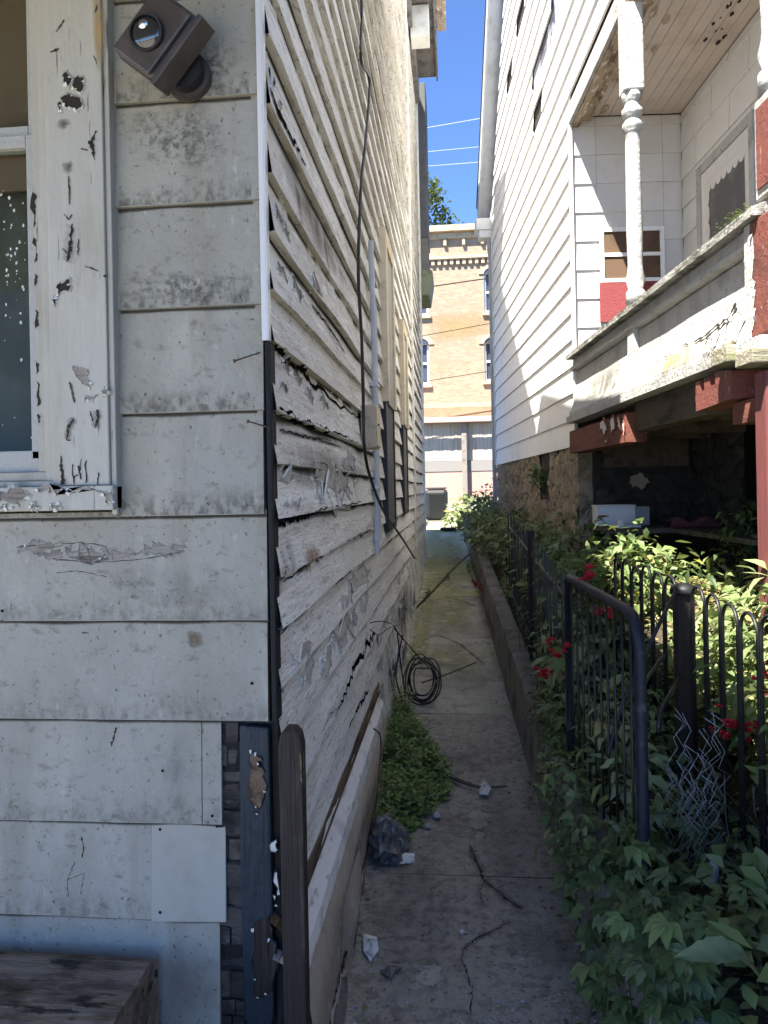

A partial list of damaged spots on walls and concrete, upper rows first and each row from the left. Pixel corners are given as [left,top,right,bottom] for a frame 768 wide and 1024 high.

peeling [703,0,741,46]
peeling [57,69,86,115]
peeling [30,192,38,285]
peeling [51,277,73,307]
peeling [71,366,111,403]
crack [280,429,342,447]
peeling [599,414,625,444]
peeling [0,482,151,518]
peeling [246,750,268,816]
peeling [269,838,279,854]
peeling [250,869,281,999]
crack [460,845,522,1014]